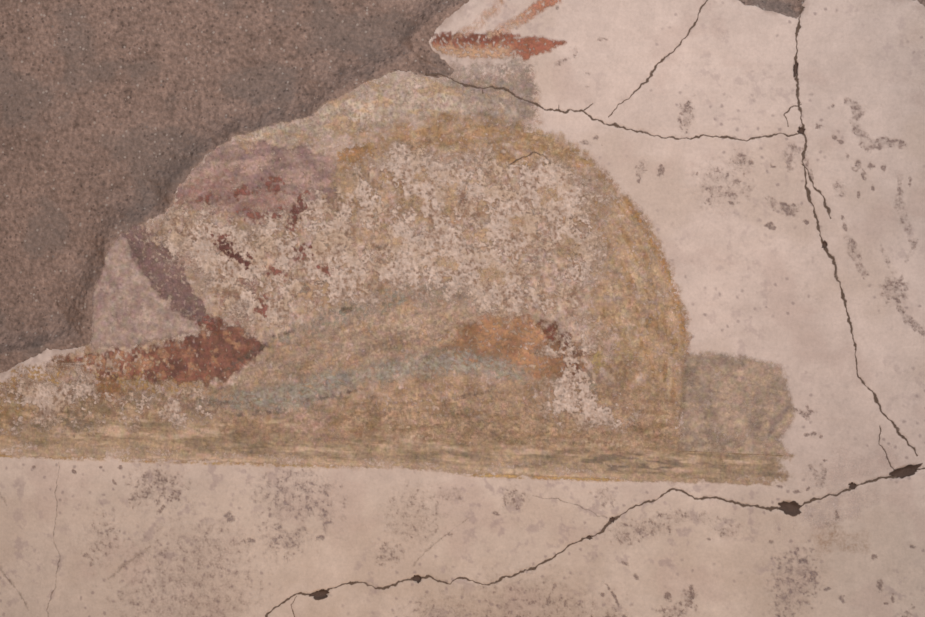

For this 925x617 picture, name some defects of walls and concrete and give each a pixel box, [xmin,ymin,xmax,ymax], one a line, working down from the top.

spalling [0,0,641,438]
crack [265,0,925,617]
spalling [739,0,804,19]